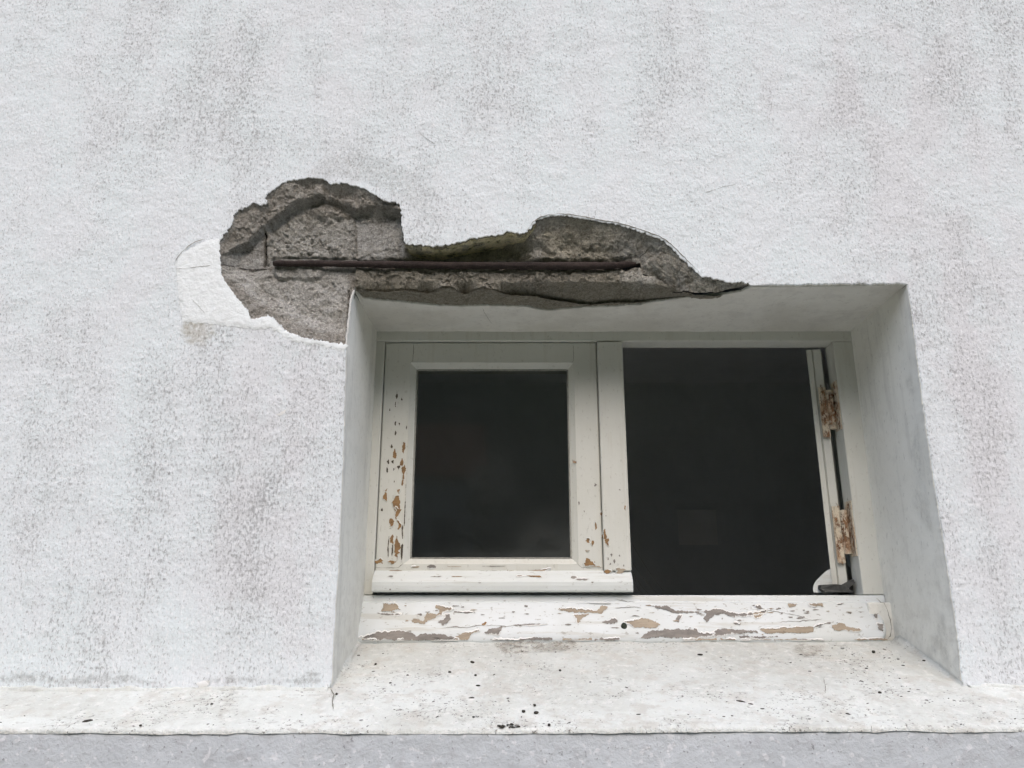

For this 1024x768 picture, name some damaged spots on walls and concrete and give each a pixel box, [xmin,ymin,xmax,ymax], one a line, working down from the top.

spalling [175,178,748,353]
peeling [358,394,888,641]